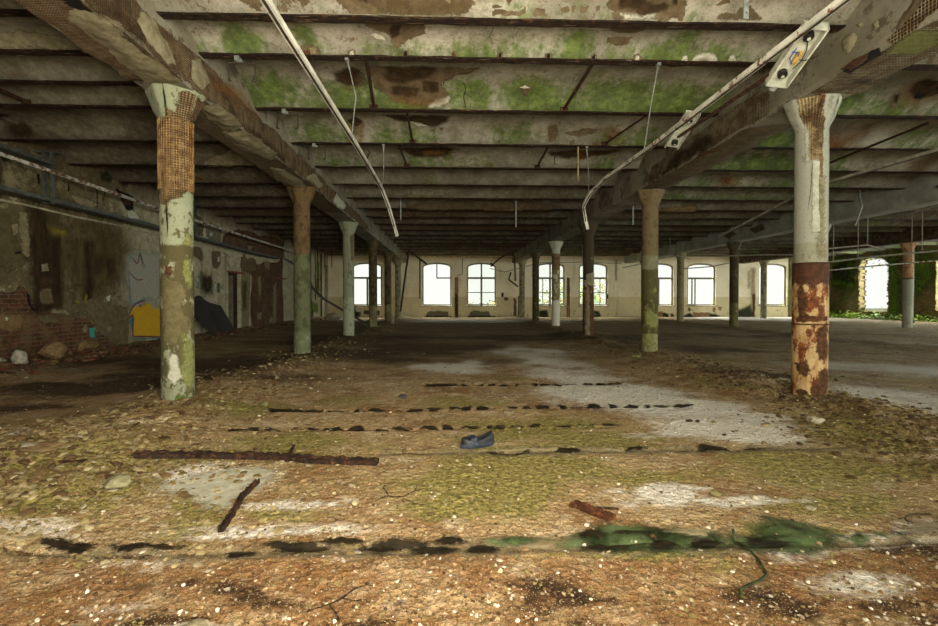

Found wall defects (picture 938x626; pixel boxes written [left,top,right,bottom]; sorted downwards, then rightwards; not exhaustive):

peeling [0,28,80,50]
spalling [276,0,311,12]
spalling [336,0,475,49]
peeling [492,0,545,16]
spalling [561,0,688,46]
damp [335,67,362,87]
peeling [0,207,31,273]
flaking render [0,284,115,360]
flaking render [162,215,284,400]
corrosion [585,272,594,335]
corrosion [738,294,756,317]
corrosion [795,283,828,396]